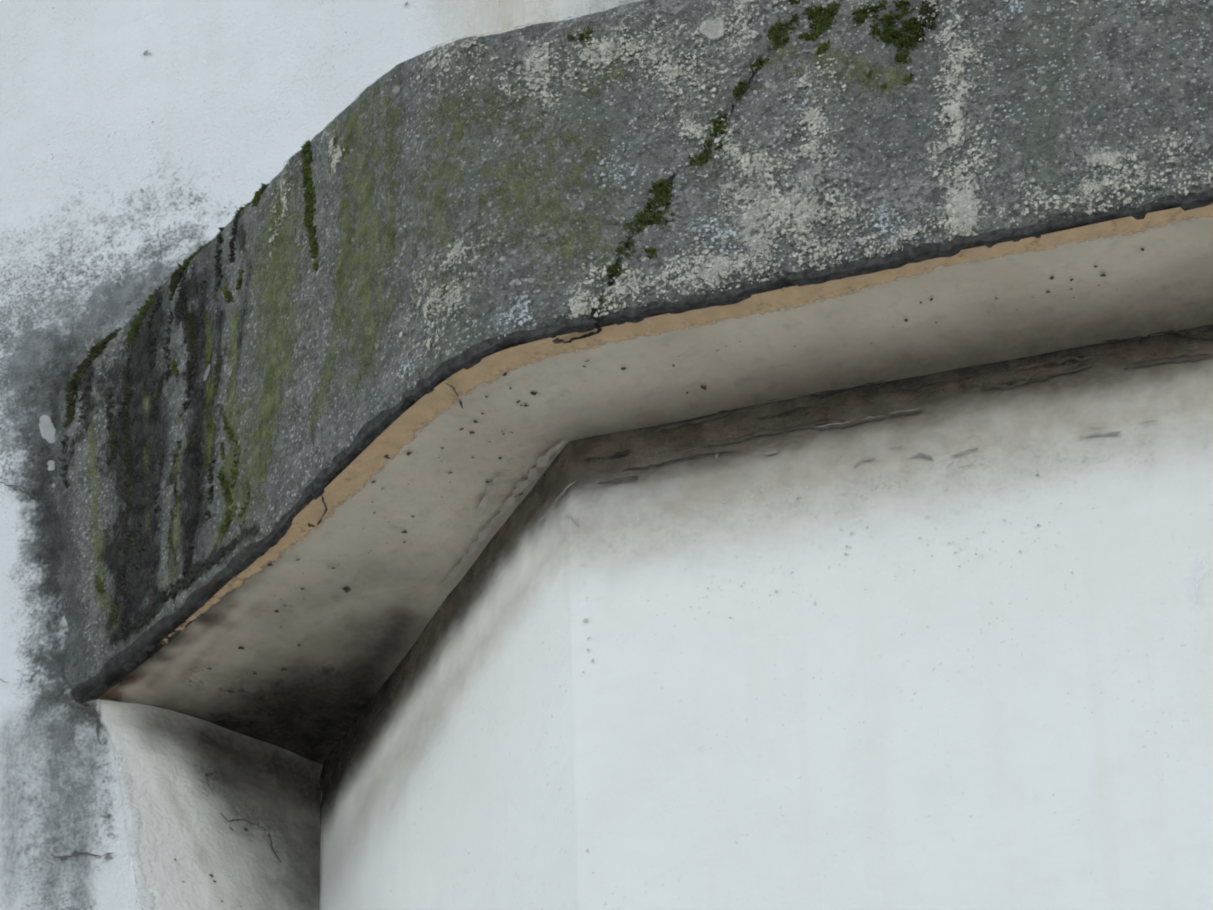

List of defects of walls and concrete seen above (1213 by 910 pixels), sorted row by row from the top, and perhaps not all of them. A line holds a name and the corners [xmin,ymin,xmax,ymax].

damp [399,222,501,343]
damp [480,0,1213,319]
crack [0,482,53,499]
damp [53,211,257,688]
damp [23,724,112,910]
damp [188,622,405,886]